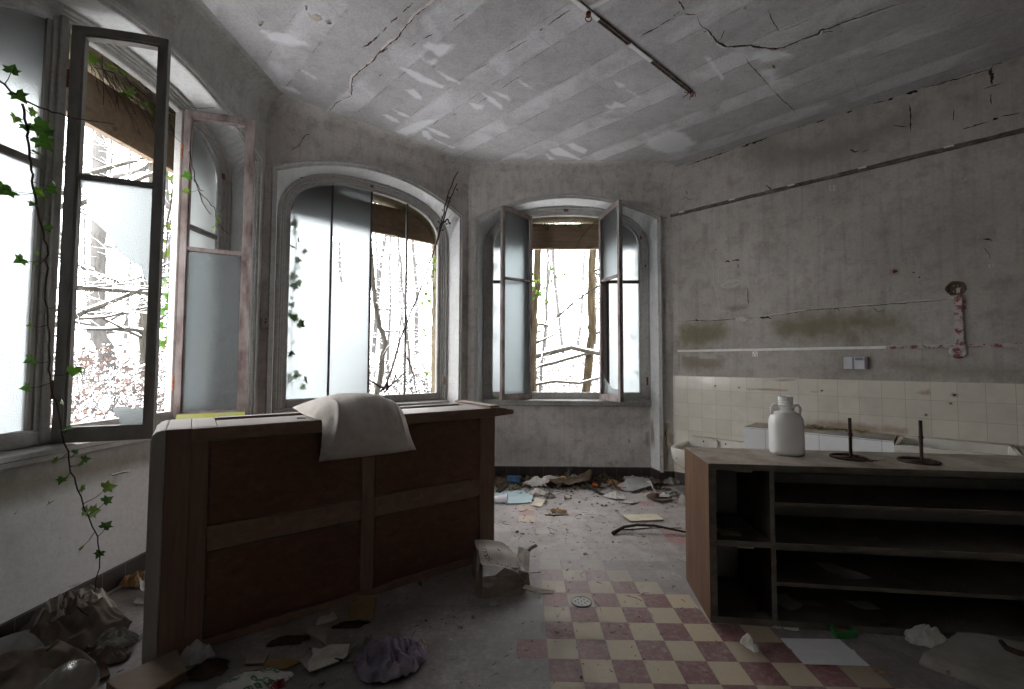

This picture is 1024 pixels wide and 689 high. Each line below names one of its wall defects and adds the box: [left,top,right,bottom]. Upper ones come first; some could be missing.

crack [327,0,435,112]
crack [642,0,1018,132]
crack [687,137,768,165]
water stain [495,301,750,471]
crack [757,297,954,319]
water stain [764,298,1024,384]